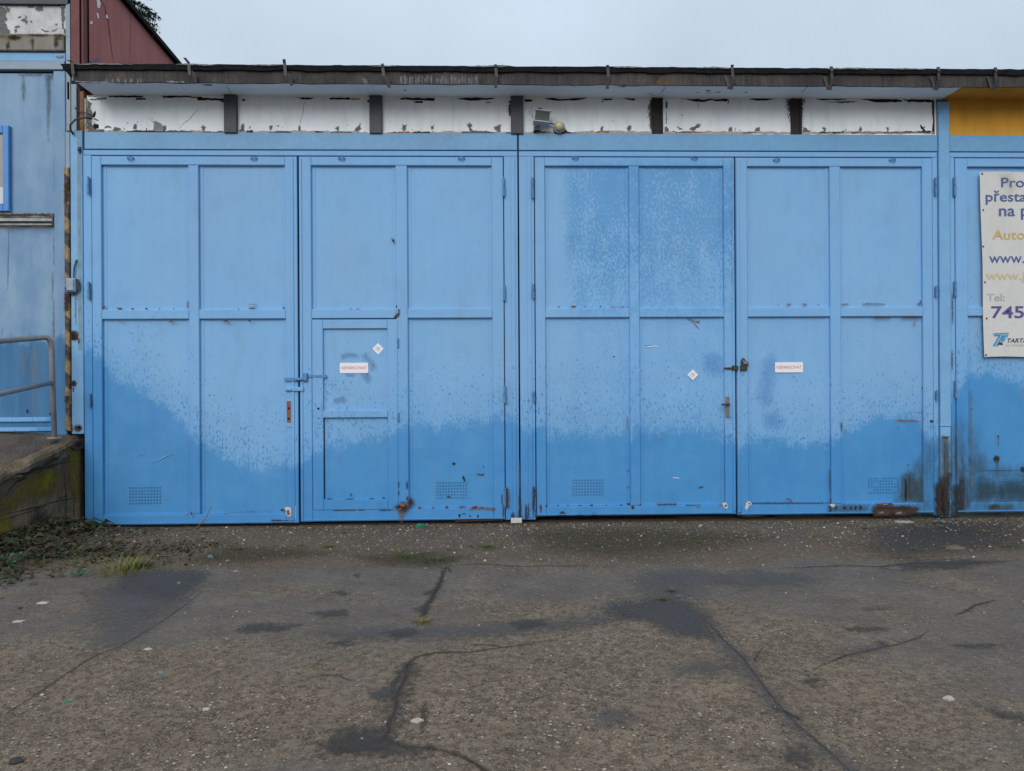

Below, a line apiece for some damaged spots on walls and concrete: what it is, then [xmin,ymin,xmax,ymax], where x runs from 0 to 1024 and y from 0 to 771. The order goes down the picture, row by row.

peeling [0,5,66,36]
peeling [87,99,224,133]
spalling [238,123,368,133]
corrosion [369,482,509,522]
corrosion [739,473,919,517]
corrosion [923,436,973,519]
crack [389,652,488,771]